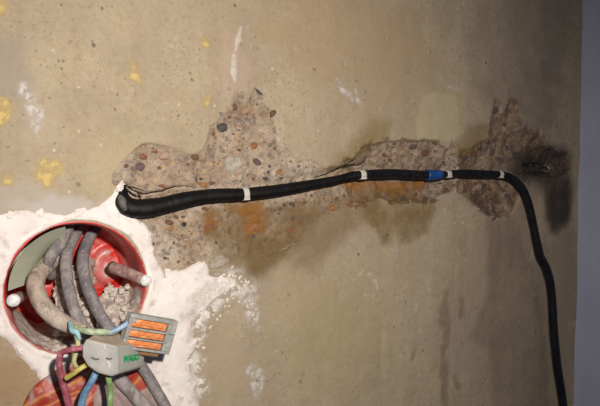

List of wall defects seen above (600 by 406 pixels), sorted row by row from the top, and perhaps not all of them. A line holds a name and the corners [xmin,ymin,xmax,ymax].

crack [314,158,366,178]
spalling [112,88,570,274]
crack [123,185,194,199]